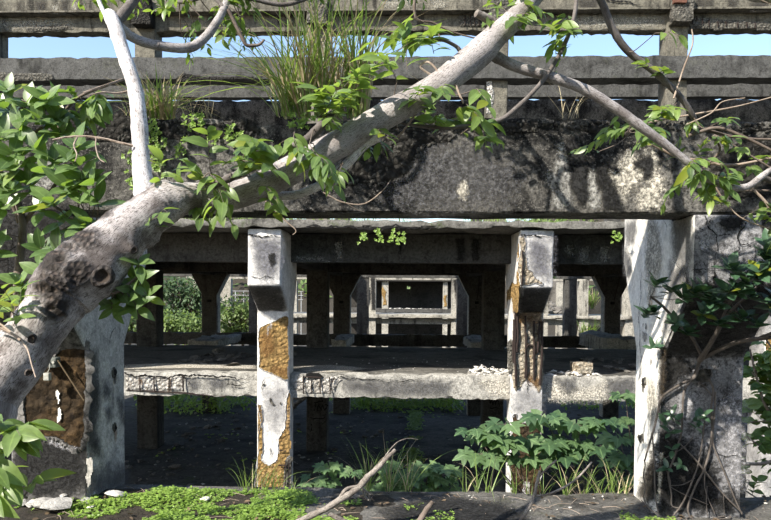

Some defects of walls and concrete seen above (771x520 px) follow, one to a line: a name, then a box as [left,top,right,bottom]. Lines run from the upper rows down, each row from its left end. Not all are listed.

spalling [18,339,95,487]
water stain [124,363,255,389]
spalling [254,315,342,487]
spalling [506,236,544,393]
water stain [546,137,678,210]
water stain [543,215,771,518]
crack [673,216,759,272]